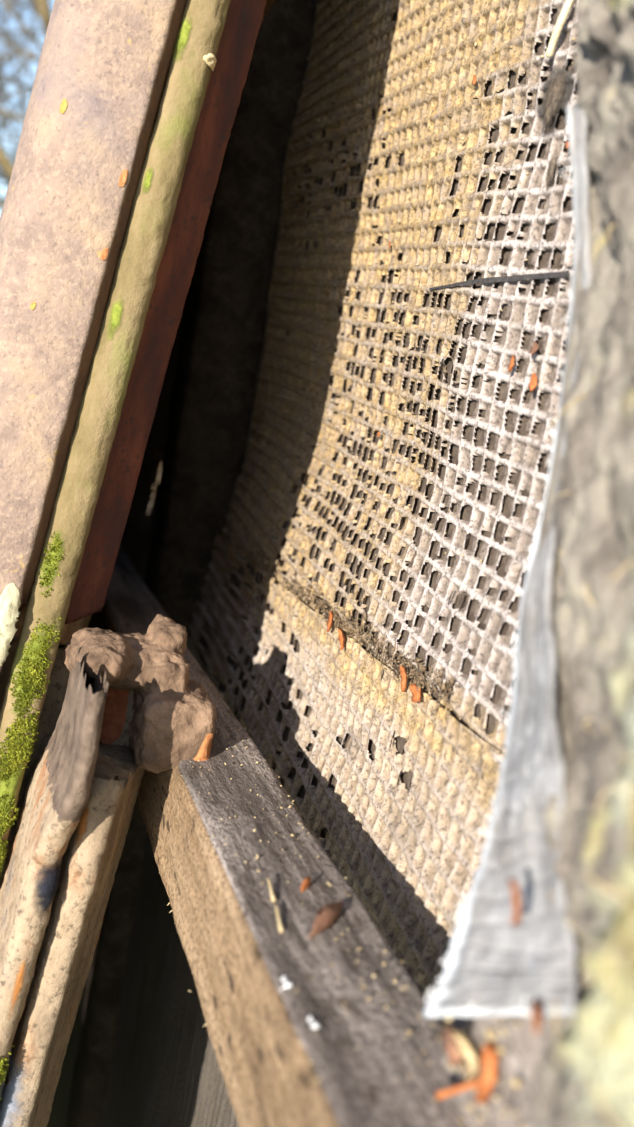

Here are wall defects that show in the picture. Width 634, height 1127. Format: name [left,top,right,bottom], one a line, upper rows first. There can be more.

spalling [193,733,213,761]